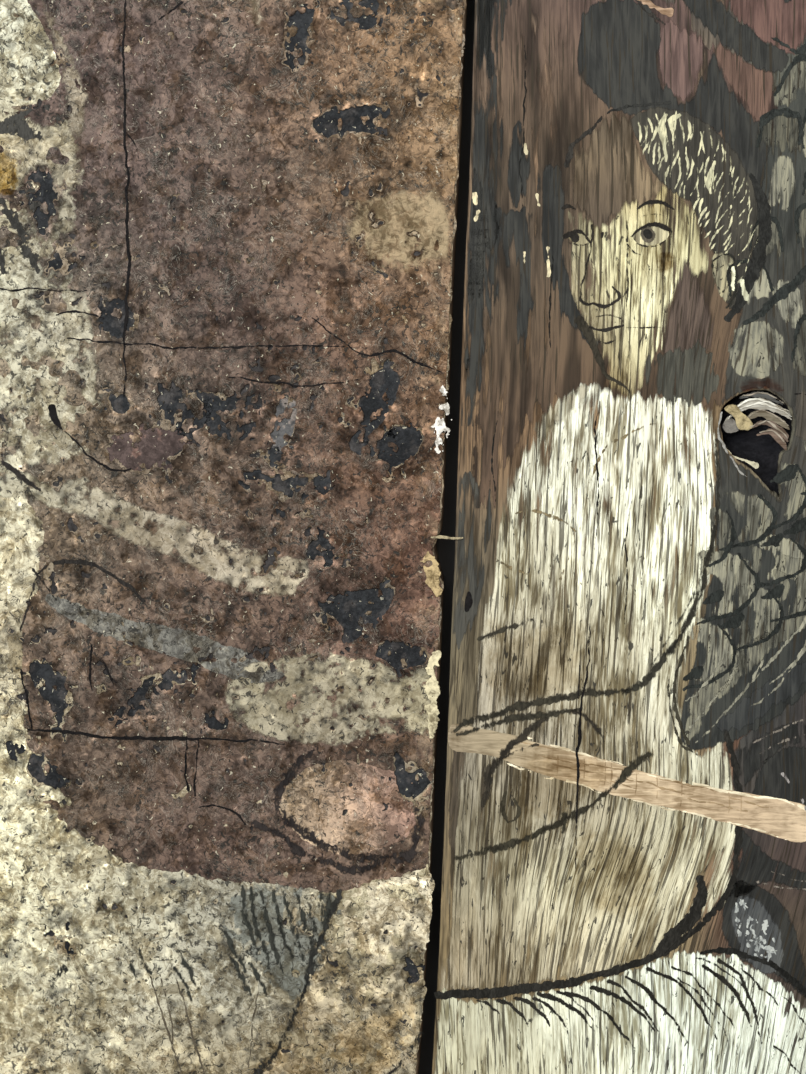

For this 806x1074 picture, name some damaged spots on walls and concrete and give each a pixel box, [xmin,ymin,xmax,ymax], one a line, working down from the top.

peeling [284,0,320,72]
peeling [330,0,394,34]
peeling [313,96,399,143]
crack [0,0,441,397]
peeling [347,359,452,475]
peeling [315,580,394,655]
peeling [372,640,441,739]